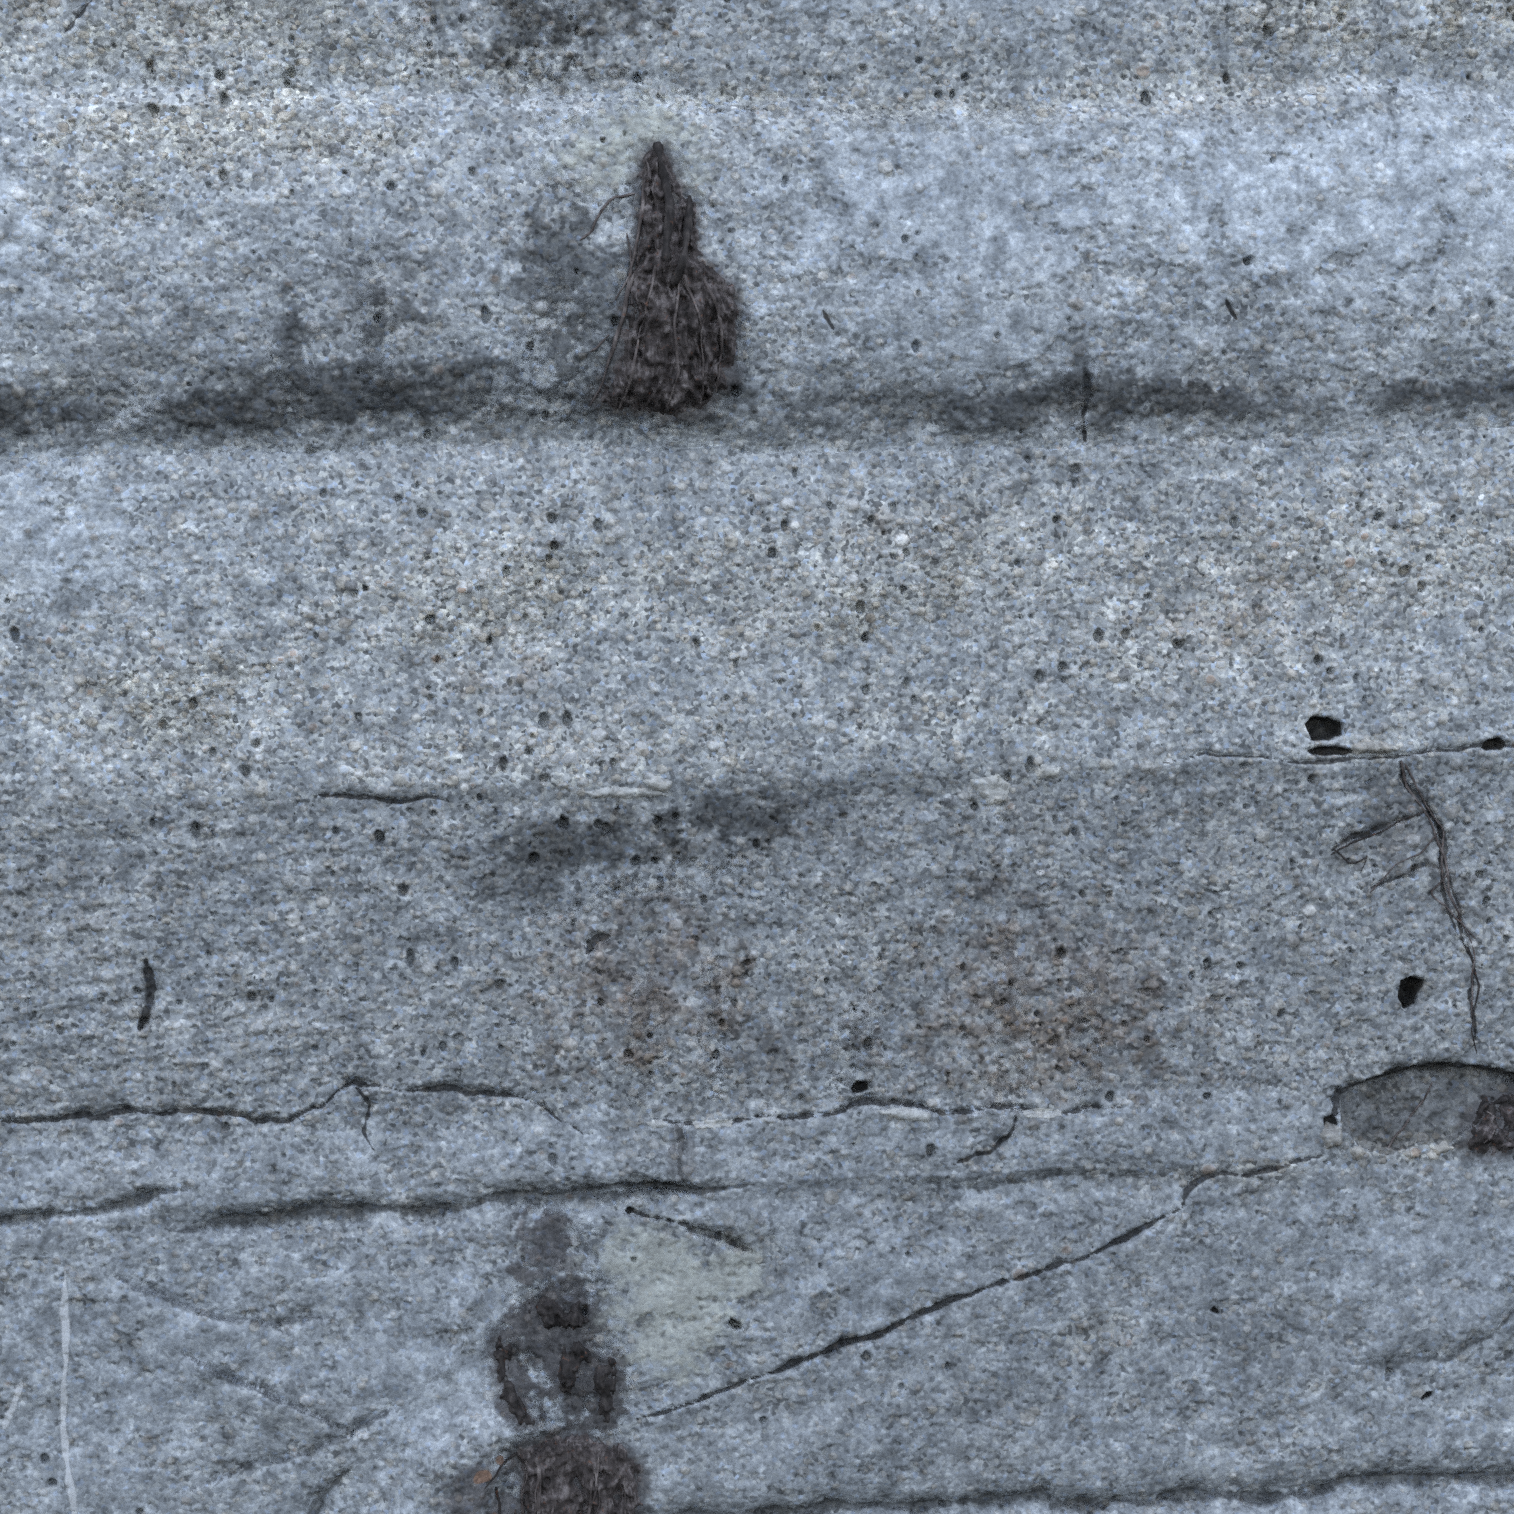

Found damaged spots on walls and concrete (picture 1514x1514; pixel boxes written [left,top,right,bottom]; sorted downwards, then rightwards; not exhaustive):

crack [64,1,92,33]
damp [491,0,666,69]
damp [545,95,709,195]
damp [510,204,632,421]
crack [1163,742,1514,1116]
crack [137,959,156,1031]
crack [1,1080,583,1150]
crack [646,1097,1122,1181]
spalling [1339,1065,1514,1155]
crack [633,1155,1323,1420]
crack [1339,1311,1514,1369]